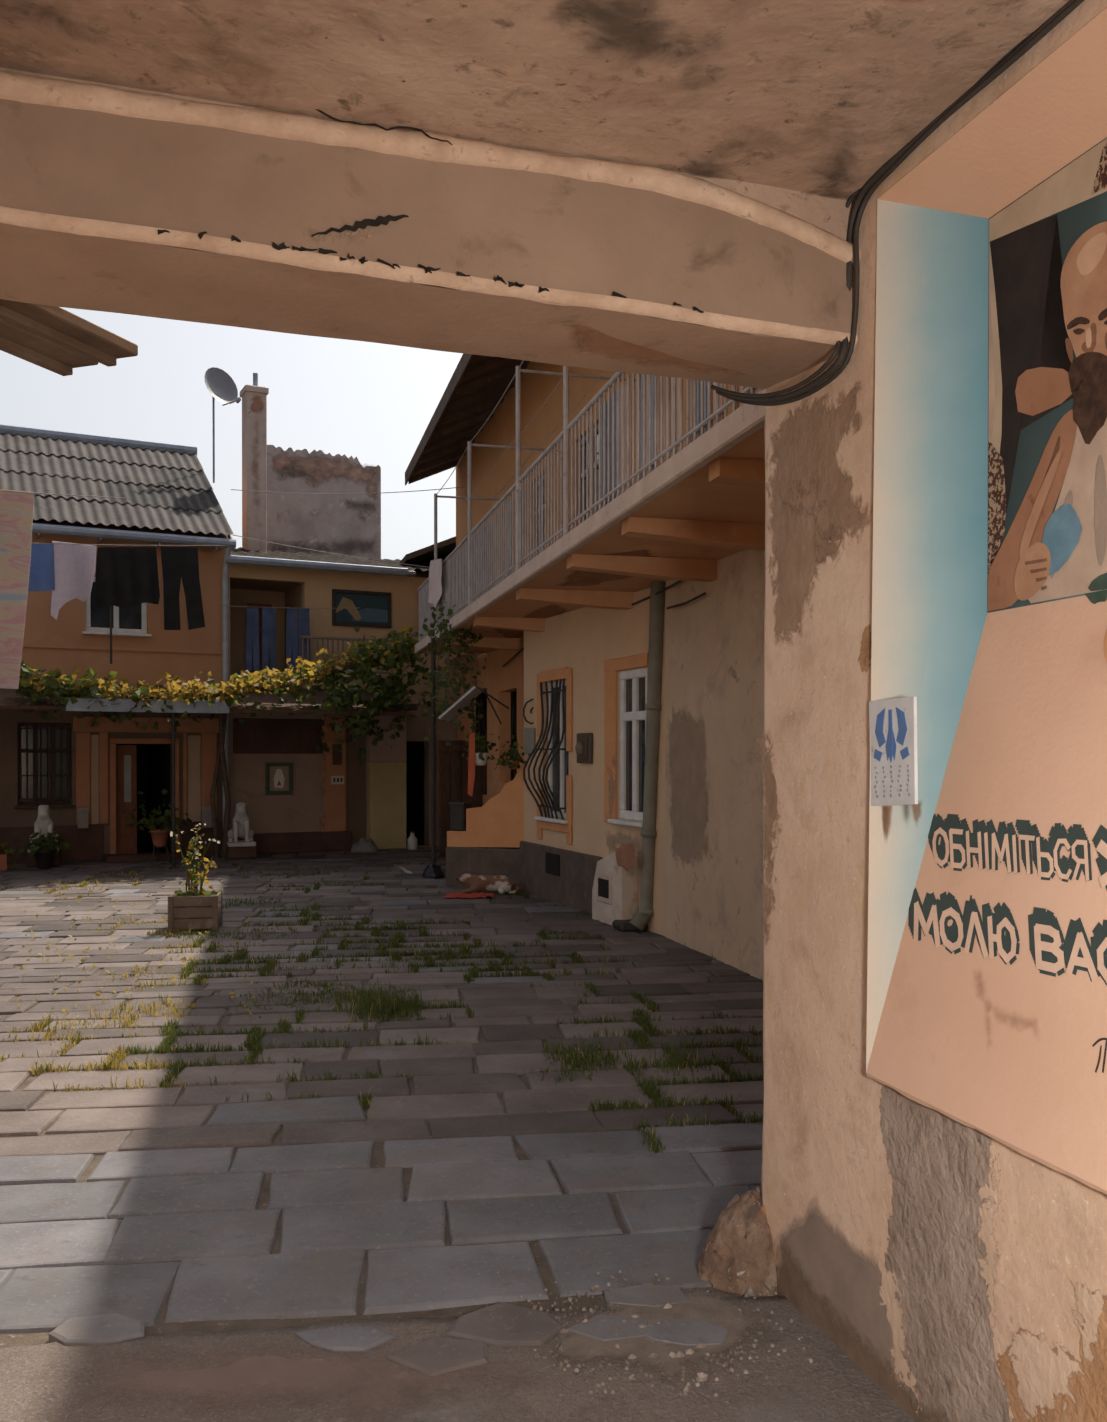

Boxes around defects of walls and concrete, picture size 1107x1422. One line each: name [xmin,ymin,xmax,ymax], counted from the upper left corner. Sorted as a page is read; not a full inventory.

damp [572,0,662,54]
peeling [766,386,868,641]
peeling [878,1085,1107,1422]